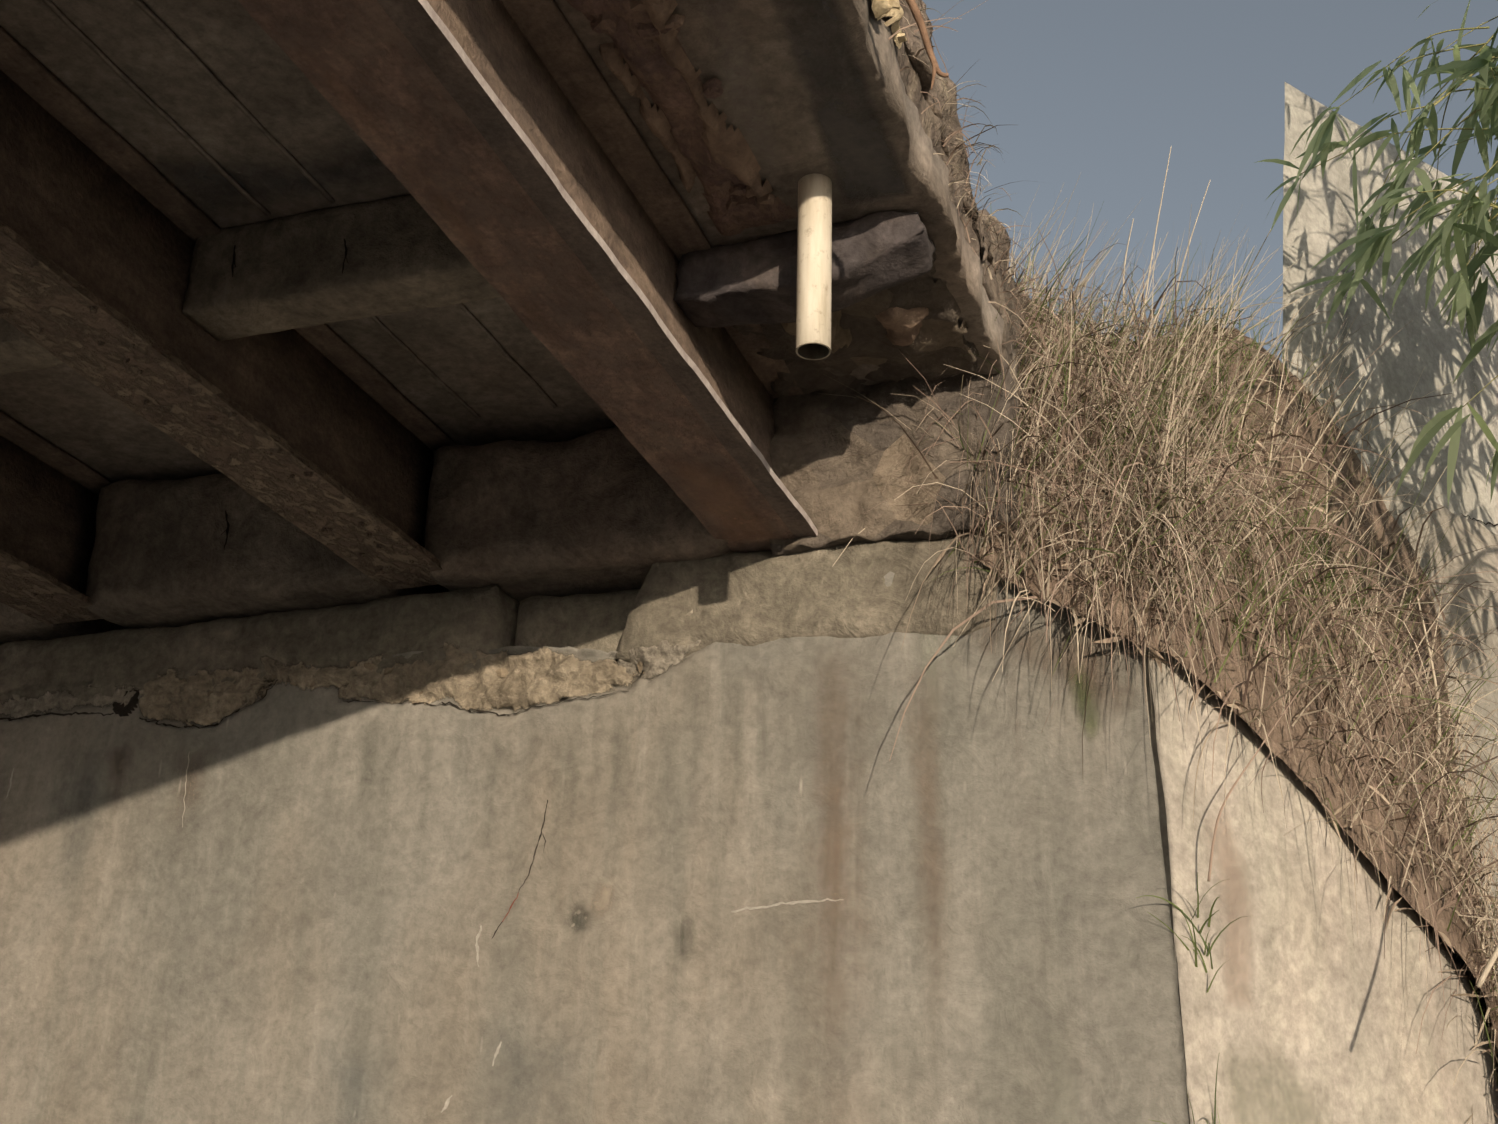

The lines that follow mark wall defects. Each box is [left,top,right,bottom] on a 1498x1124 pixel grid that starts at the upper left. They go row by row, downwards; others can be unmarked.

spalling [566,0,798,236]
crack [1461,513,1498,527]
spalling [0,666,278,729]
spalling [338,640,701,716]
crack [492,800,548,938]